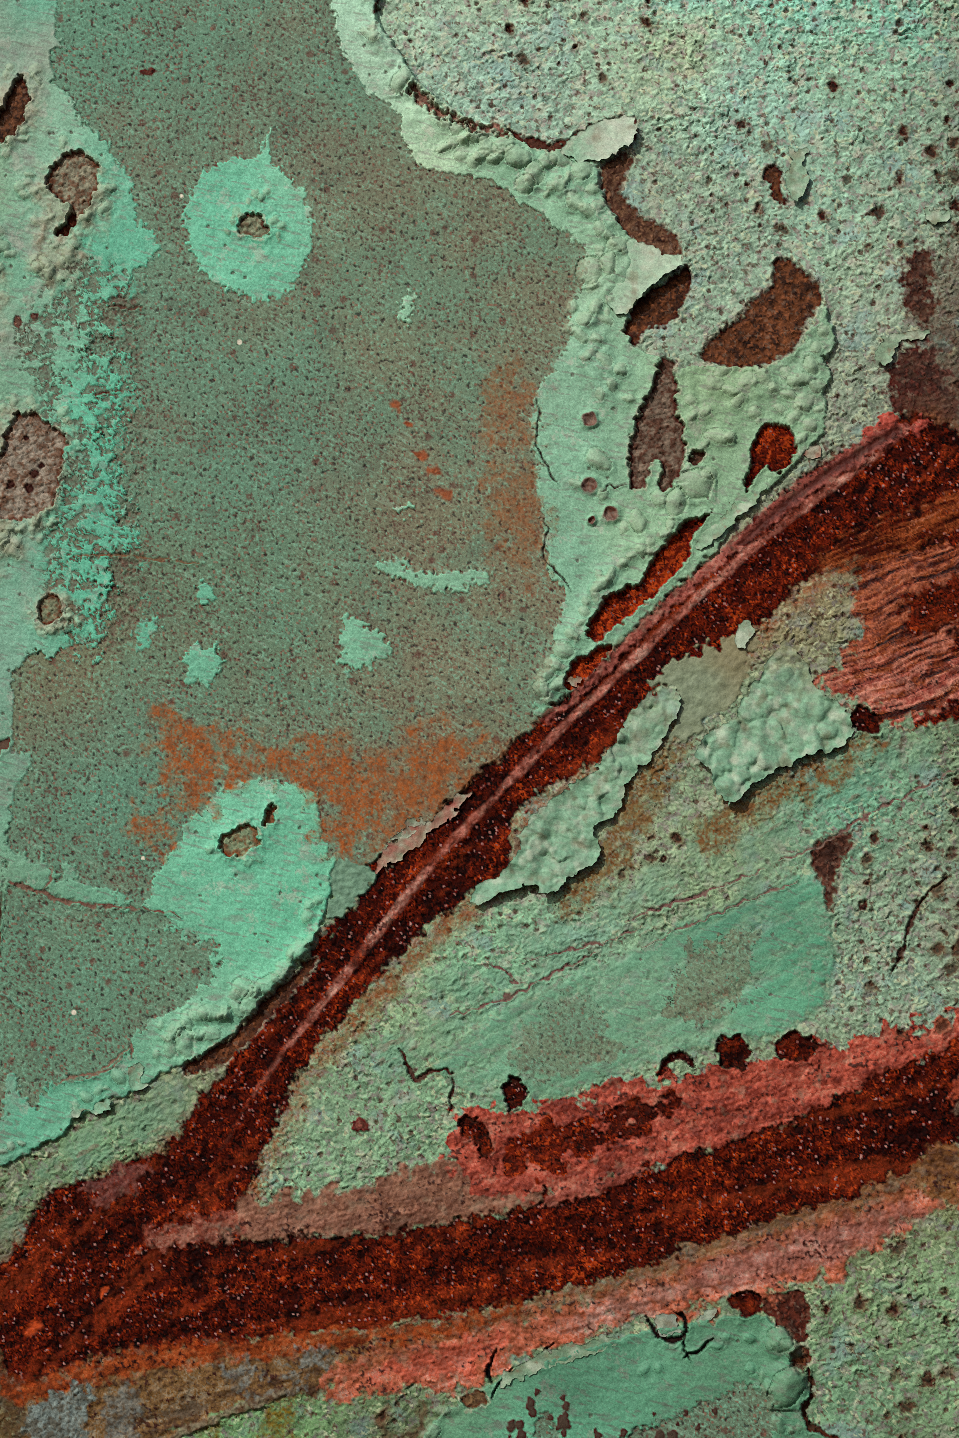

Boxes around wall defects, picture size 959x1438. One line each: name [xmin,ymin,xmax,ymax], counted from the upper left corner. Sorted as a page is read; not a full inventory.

corrosion [390,400,414,427]
peeling [0,0,854,1118]
corrosion [467,350,559,596]
corrosion [874,242,959,431]
corrosion [0,411,959,1438]
crack [397,1048,457,1117]
crack [643,1307,717,1361]